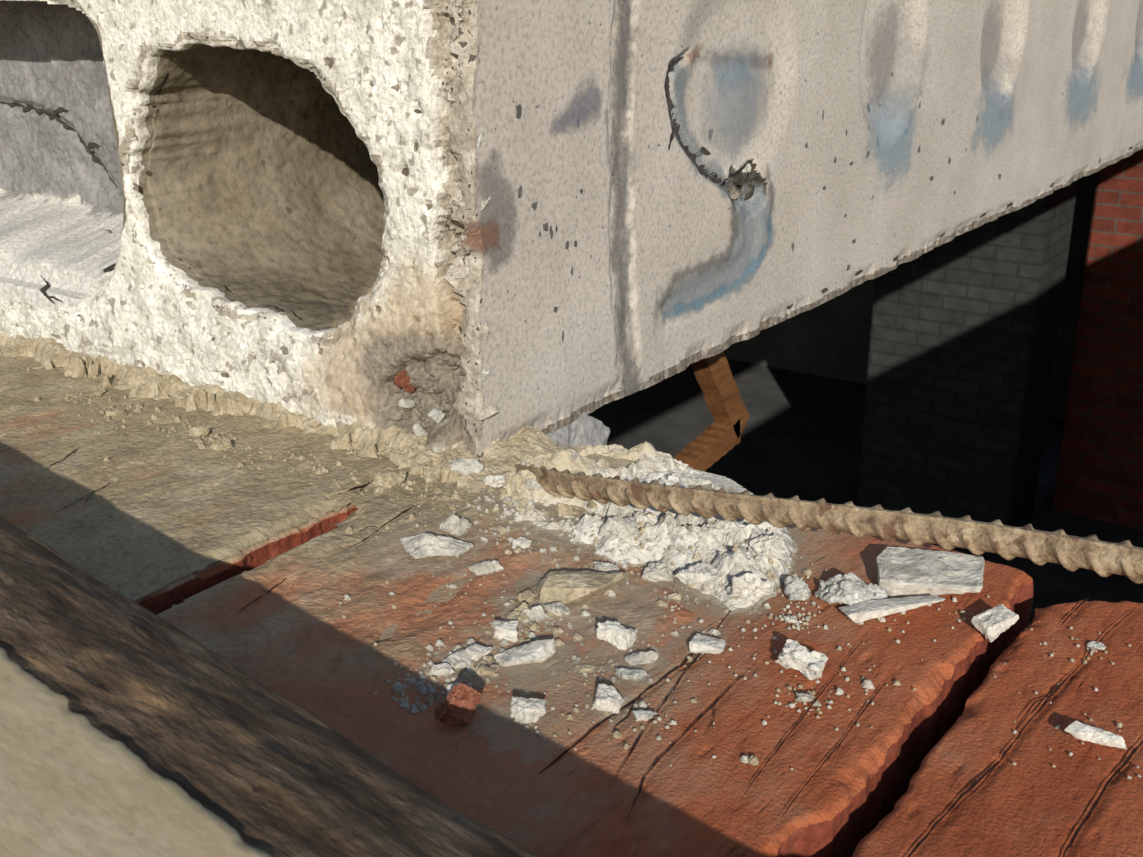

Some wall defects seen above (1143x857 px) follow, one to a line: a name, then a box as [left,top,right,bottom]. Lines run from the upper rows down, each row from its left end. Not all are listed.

spalling [127,29,240,95]
spalling [254,41,351,120]
crack [0,101,117,188]
spalling [118,112,145,191]
spalling [364,140,383,189]
spalling [127,204,276,341]
spalling [312,236,389,355]
spalling [379,0,498,459]